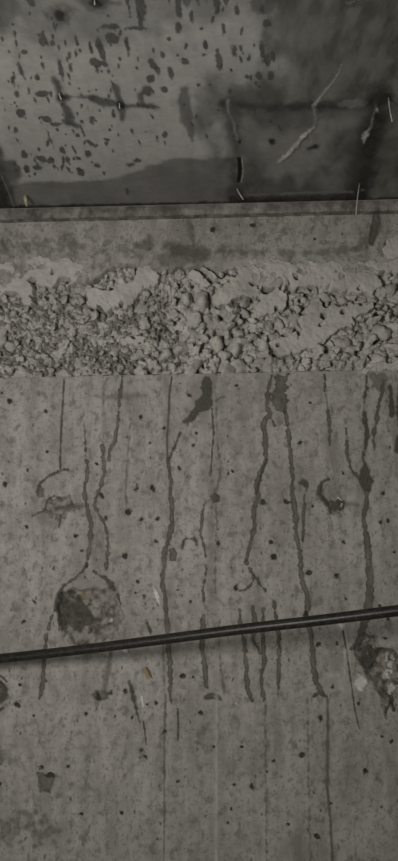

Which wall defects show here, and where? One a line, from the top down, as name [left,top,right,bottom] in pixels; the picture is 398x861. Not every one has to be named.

water stain [82,85,157,120]
flaking render [0,310,159,378]
flaking render [134,295,162,329]
flaking render [180,290,269,378]
water stain [82,376,123,570]
water stain [153,376,221,704]
water stain [239,373,311,616]
water stain [345,375,398,609]
spalling [54,564,125,654]
water stain [238,600,281,702]
spalling [355,636,398,717]
water stain [306,627,333,861]